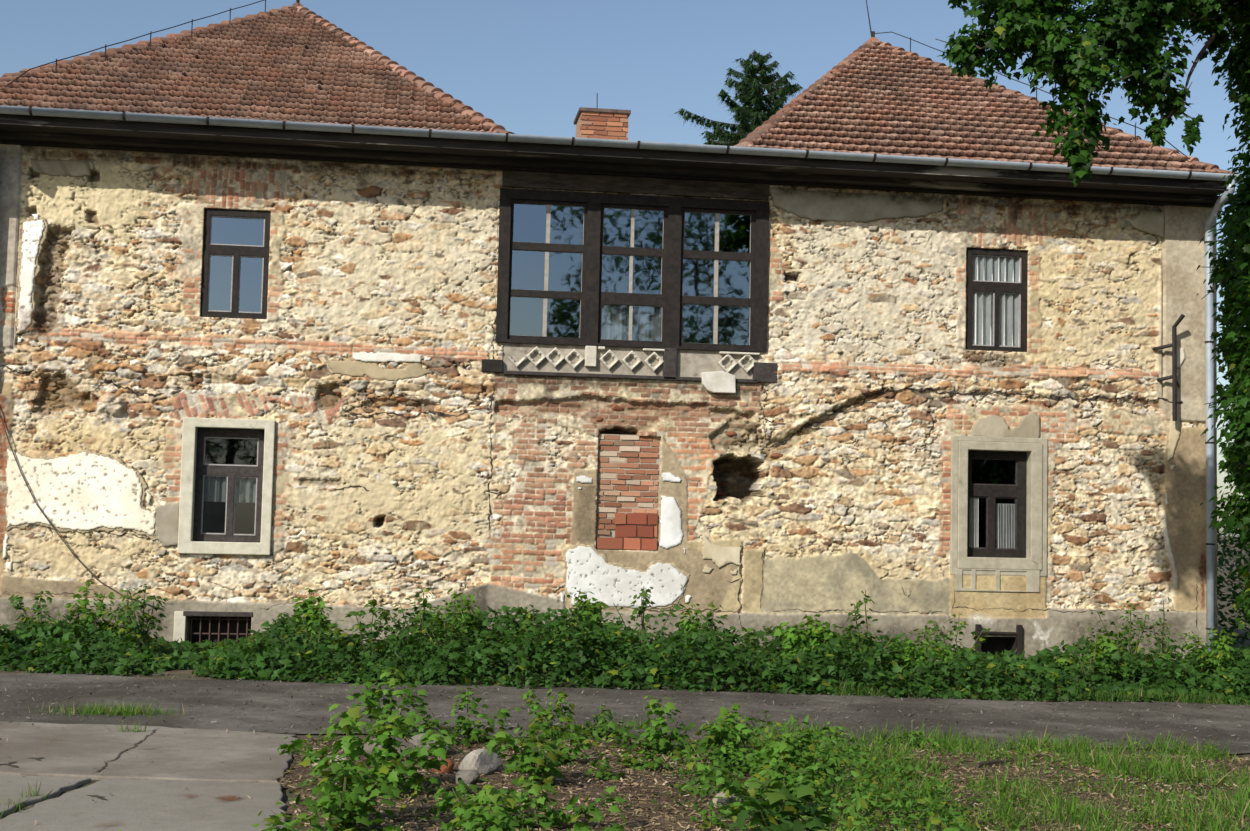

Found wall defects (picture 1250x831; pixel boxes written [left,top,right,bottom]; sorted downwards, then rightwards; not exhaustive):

flaking render [28,157,100,183]
flaking render [769,187,958,231]
spalling [15,206,101,343]
spalling [784,273,801,282]
spalling [30,370,99,418]
flaking render [312,351,446,413]
crack [763,359,1183,447]
spalling [494,386,892,501]
flaking render [1167,415,1180,470]
flaking render [3,448,180,570]
spalling [297,477,343,487]
spalling [373,515,386,528]